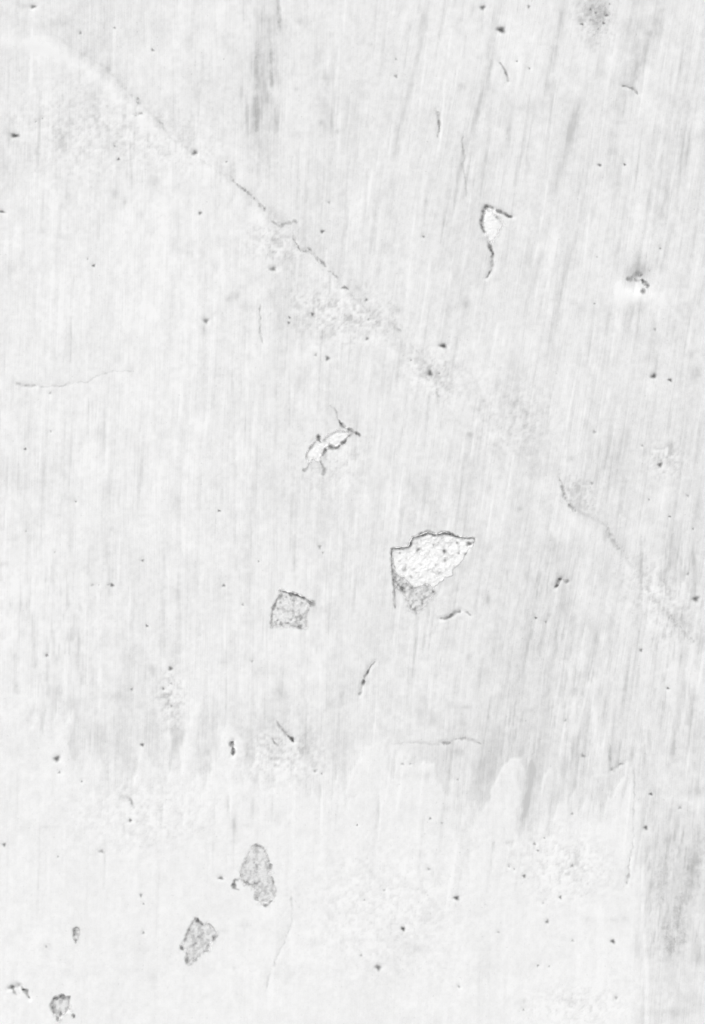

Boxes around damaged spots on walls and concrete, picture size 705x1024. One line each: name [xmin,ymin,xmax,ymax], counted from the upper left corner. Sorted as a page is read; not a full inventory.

peeling [483,210,502,242]
spalling [306,416,360,463]
spalling [385,526,475,611]
spalling [271,584,315,628]